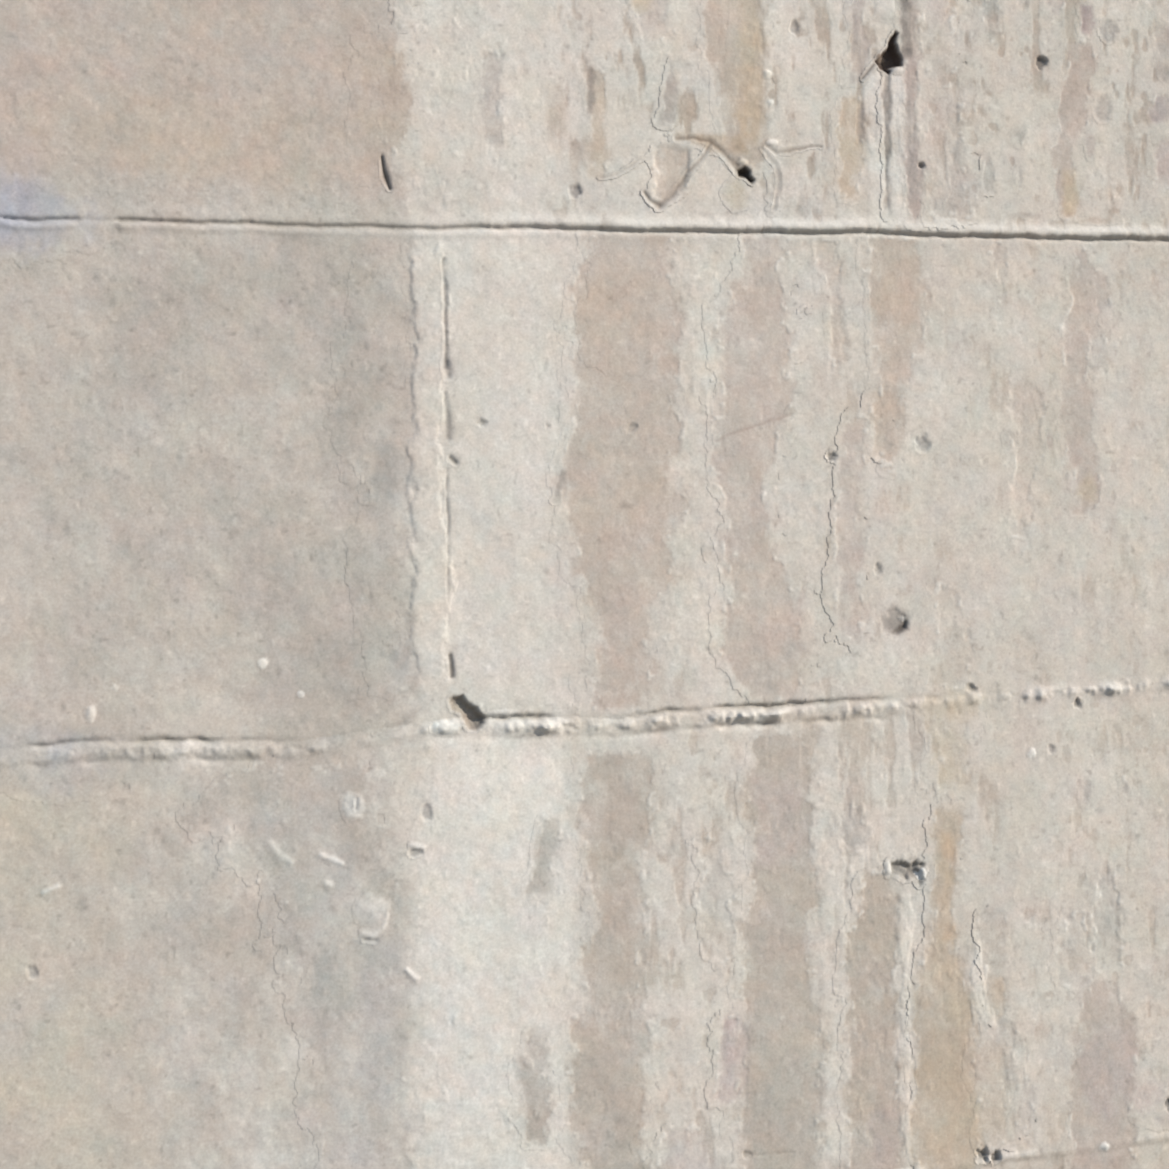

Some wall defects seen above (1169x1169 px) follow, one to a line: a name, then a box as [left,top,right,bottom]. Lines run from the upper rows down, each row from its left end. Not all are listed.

crack [597,133,824,212]
spalling [860,28,906,222]
water stain [540,0,1029,719]
crack [371,254,461,737]
spalling [419,691,522,754]
water stain [176,730,918,1169]
spalling [883,855,929,890]
water stain [961,904,1041,1152]